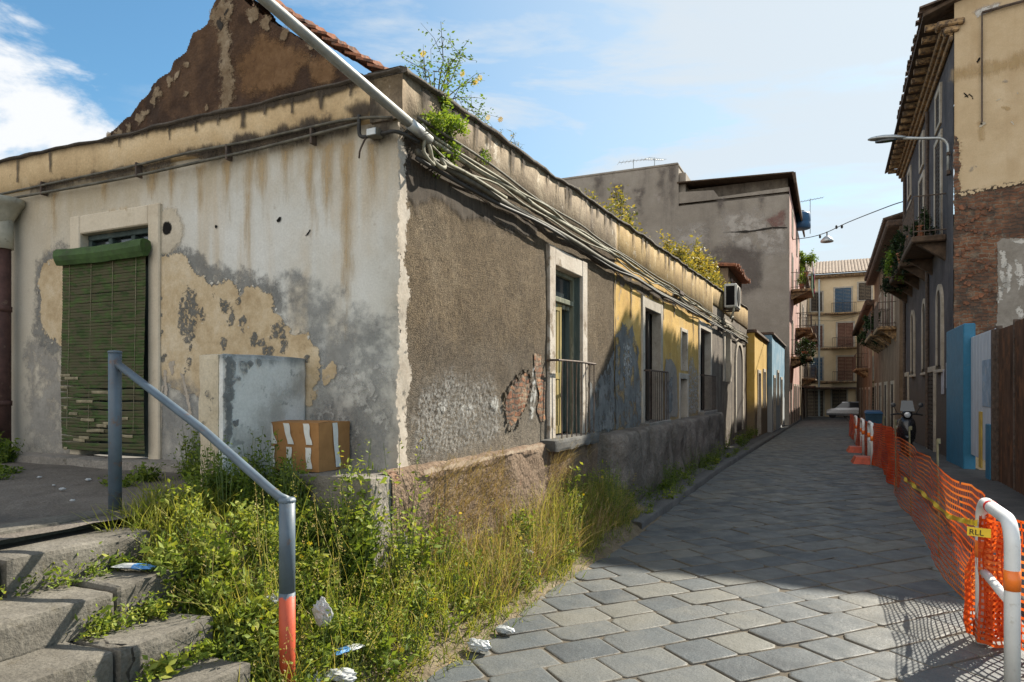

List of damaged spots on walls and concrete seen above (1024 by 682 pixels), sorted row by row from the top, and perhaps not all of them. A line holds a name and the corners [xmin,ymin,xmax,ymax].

spalling [106,62,189,137]
peeling [237,6,335,93]
spalling [953,135,1024,335]
peeling [32,243,66,355]
peeling [161,207,337,445]
spalling [502,353,545,432]